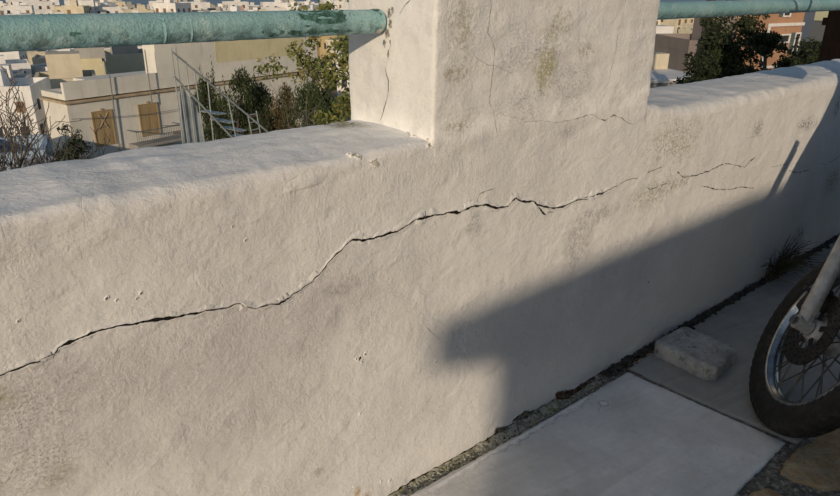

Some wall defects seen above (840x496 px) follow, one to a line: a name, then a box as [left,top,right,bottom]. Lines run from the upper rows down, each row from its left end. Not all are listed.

crack [473,4,647,131]
crack [0,158,754,379]